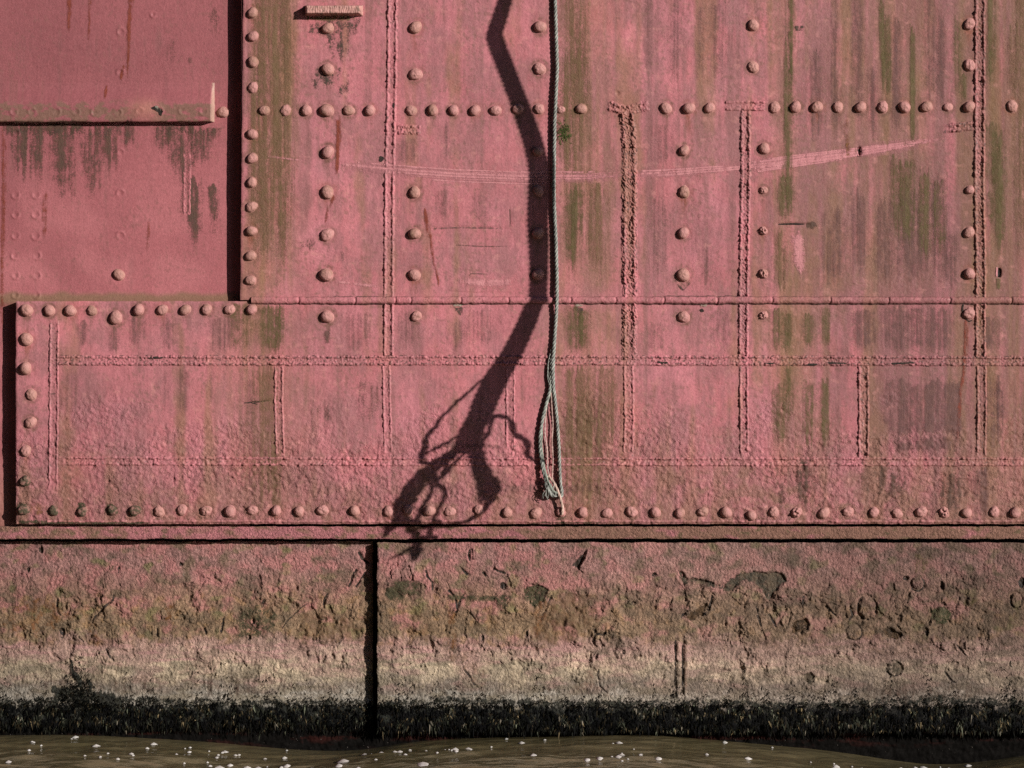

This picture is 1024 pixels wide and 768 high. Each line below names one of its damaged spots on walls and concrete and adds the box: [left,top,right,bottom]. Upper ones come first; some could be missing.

water stain [6,119,134,193]
water stain [156,124,220,238]
water stain [342,0,955,286]
water stain [803,381,829,444]
peeling [572,549,592,573]
peeling [524,585,548,608]
peeling [679,572,796,621]
peeling [738,628,775,657]
water stain [0,660,364,727]
water stain [384,680,1024,710]